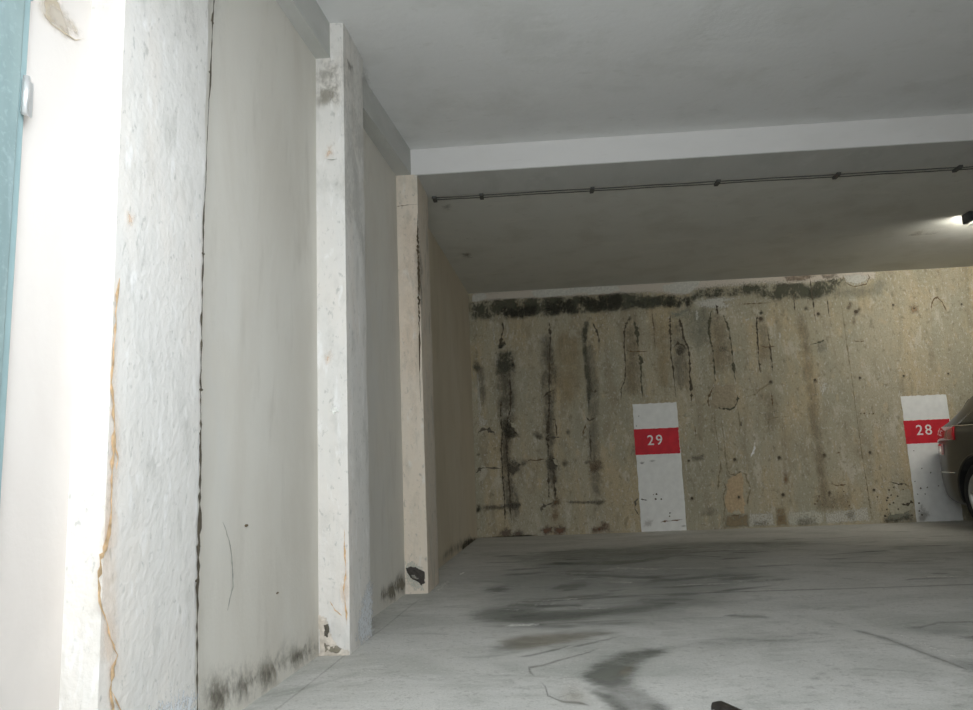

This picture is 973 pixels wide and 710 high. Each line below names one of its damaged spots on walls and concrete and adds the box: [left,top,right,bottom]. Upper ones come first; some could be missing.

damp [472,273,870,321]
damp [474,365,519,438]
damp [476,457,567,474]
spalling [717,462,751,524]